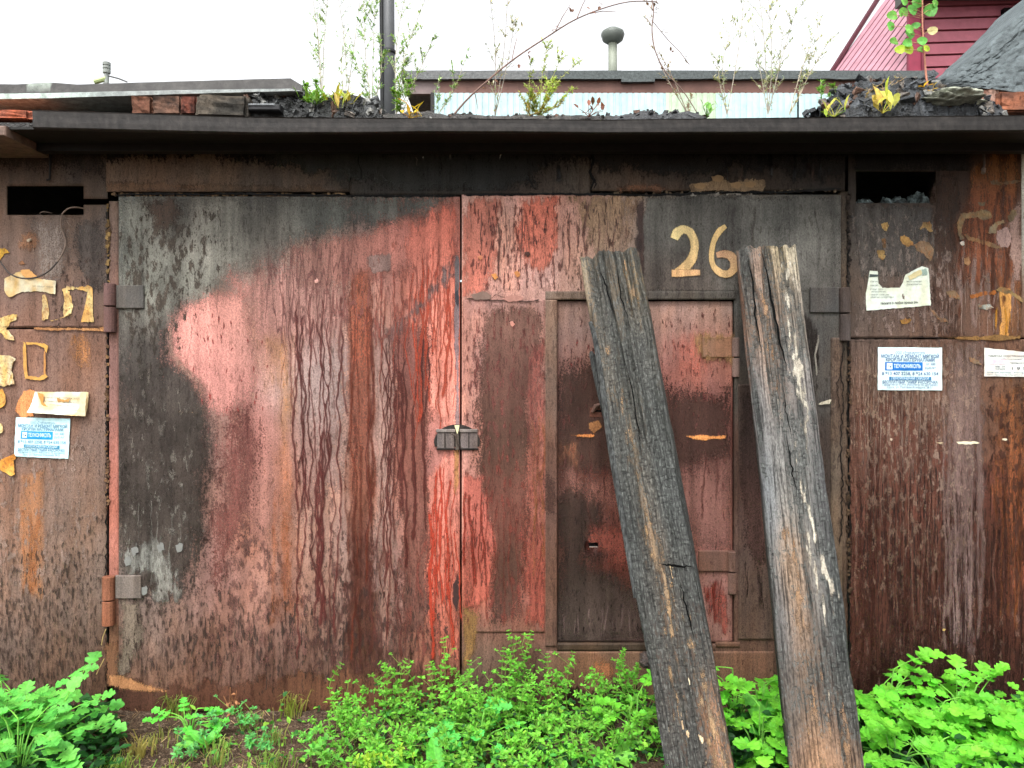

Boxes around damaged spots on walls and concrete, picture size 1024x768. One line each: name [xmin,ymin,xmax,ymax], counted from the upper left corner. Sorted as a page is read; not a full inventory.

rust [15,389,35,418]
rust [20,472,43,596]
rust [34,326,104,372]
rust [109,196,545,711]
damp [52,196,645,705]
rust [557,354,644,640]
damp [650,308,730,552]
rust [663,375,766,608]
rust [704,581,729,635]
rust [850,379,1024,707]
rust [953,154,1022,341]